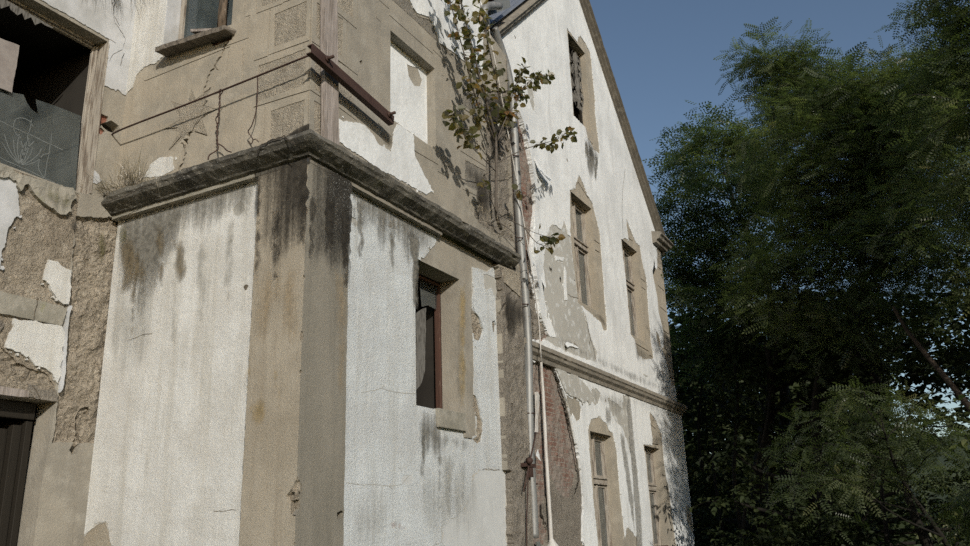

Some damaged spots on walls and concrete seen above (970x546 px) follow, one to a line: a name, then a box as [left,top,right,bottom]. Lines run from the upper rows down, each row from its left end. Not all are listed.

flaking render [0,163,79,404]
leakage [121,184,260,310]
leakage [301,195,425,304]
peeling [417,234,497,443]
peeling [476,91,607,362]
spalling [69,407,87,454]
peeling [84,521,111,546]
flaking render [533,362,637,546]
peeling [643,413,677,546]